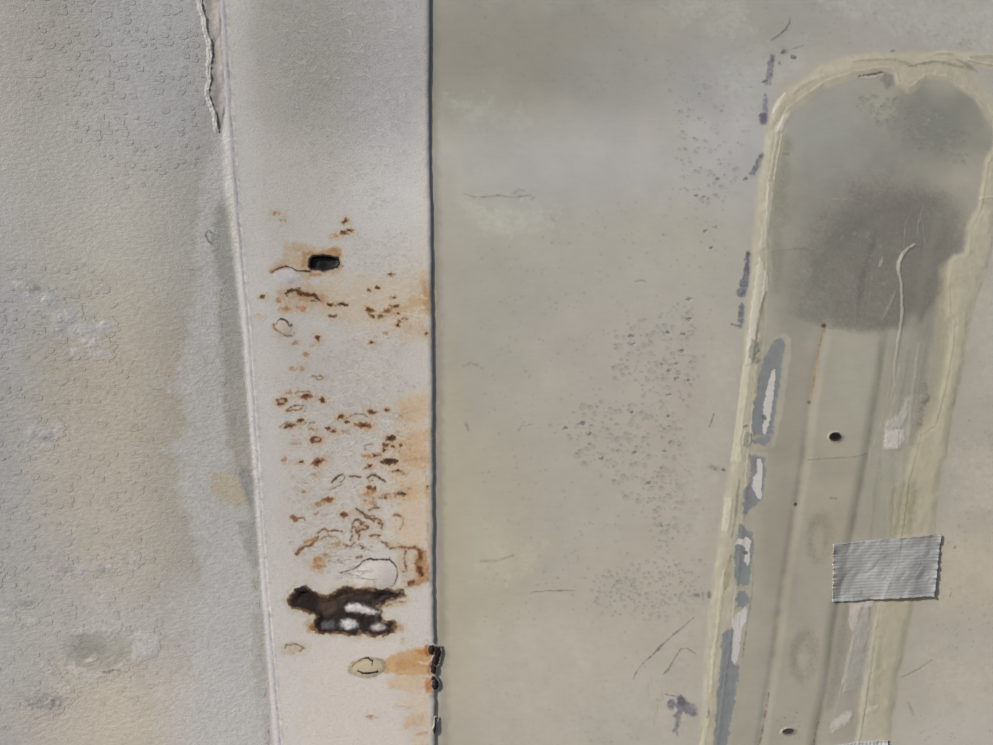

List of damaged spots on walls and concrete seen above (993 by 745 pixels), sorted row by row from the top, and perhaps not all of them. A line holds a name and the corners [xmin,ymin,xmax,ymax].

crack [197,0,220,134]
corrosion [255,208,447,745]
peeling [708,330,793,745]